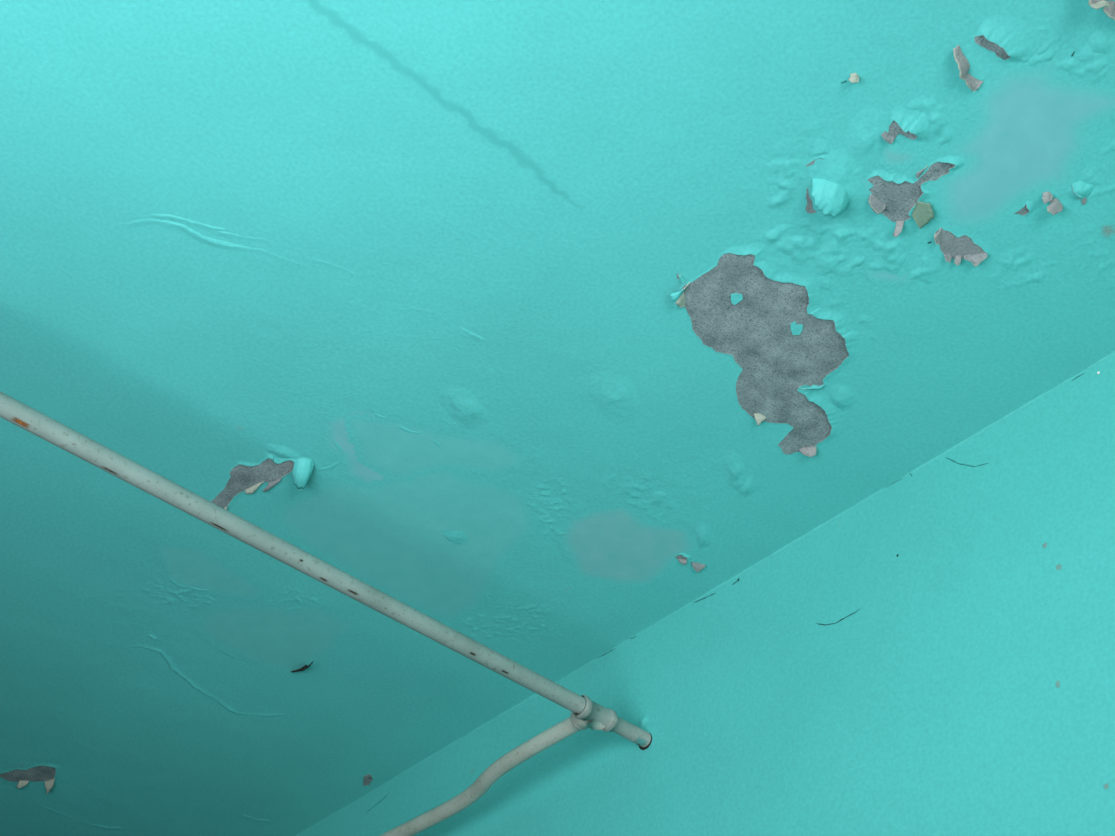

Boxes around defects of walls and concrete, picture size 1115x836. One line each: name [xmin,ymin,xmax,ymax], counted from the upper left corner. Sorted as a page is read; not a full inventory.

peeling [1088,0,1115,20]
peeling [805,14,1115,267]
peeling [670,243,861,457]
peeling [209,443,314,510]
peeling [0,763,62,794]